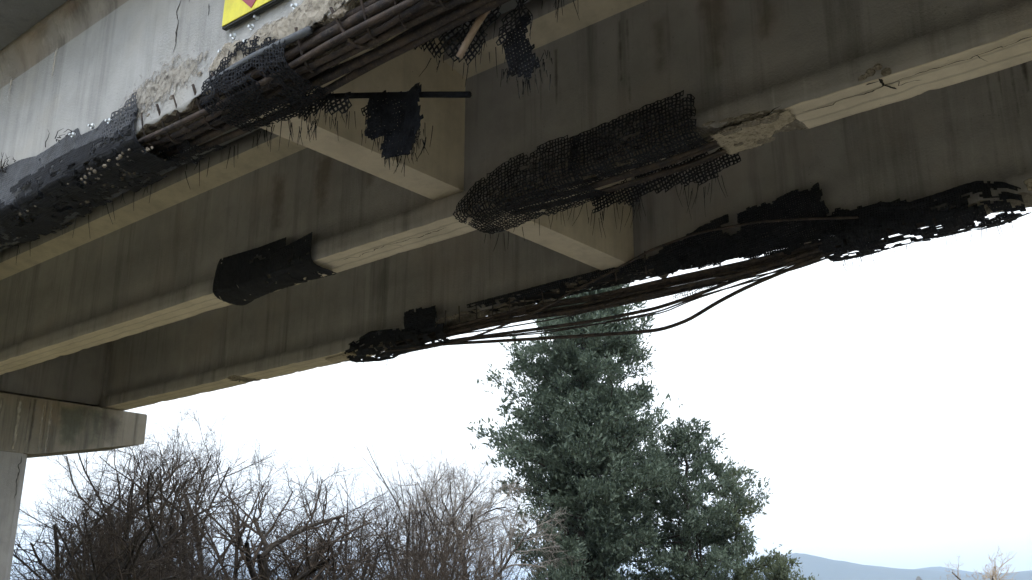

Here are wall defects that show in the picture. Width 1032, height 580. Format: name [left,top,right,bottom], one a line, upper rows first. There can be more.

spalling [120,0,348,119]
peeling [702,110,796,155]